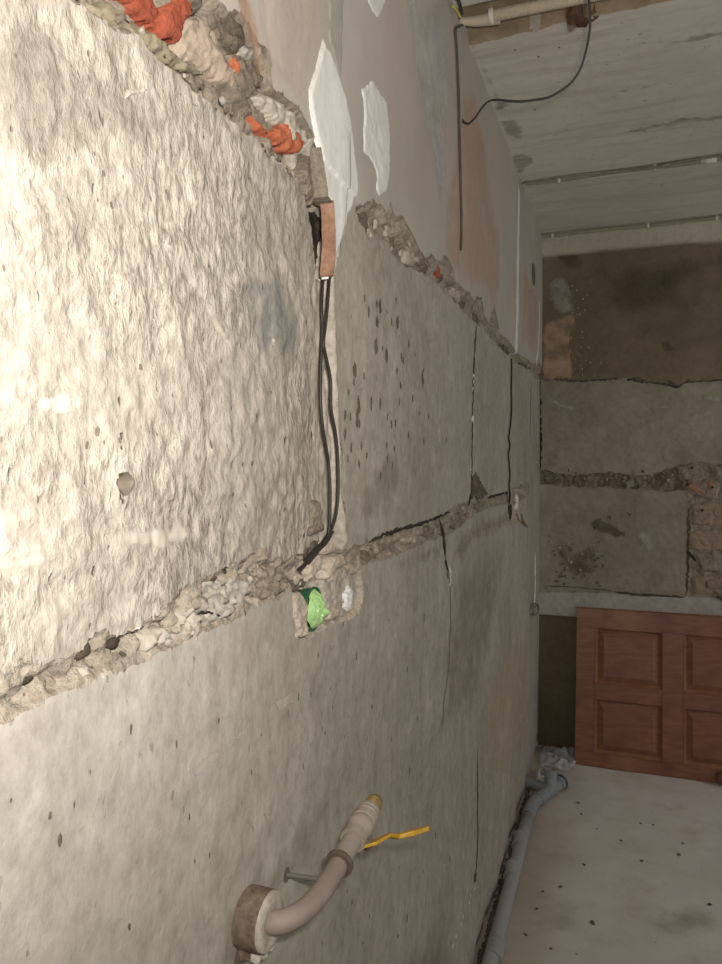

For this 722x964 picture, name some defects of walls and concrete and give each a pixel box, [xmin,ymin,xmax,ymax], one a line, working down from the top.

flaking render [71,0,314,178]
spalling [344,362,396,469]
spalling [364,294,416,405]
crack [468,326,488,506]
flaking render [355,198,722,388]
spalling [74,642,91,662]
spalling [105,637,120,650]
spalling [289,500,364,641]
crack [439,518,452,741]
spalling [506,488,528,528]
flaking render [677,460,722,596]